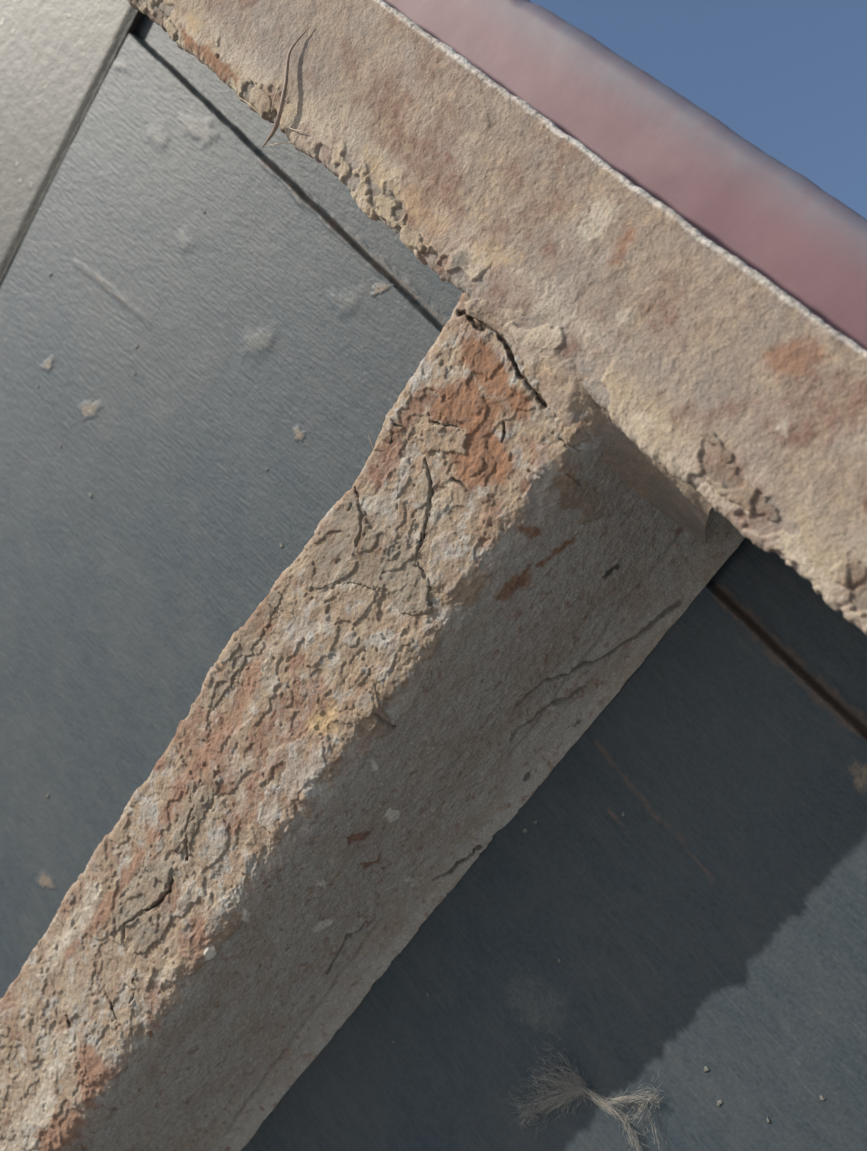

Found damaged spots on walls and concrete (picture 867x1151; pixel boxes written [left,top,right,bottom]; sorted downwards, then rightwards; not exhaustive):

peeling [127,0,184,50]
peeling [236,77,277,123]
peeling [364,185,432,255]
corrosion [256,153,539,501]
crack [454,308,548,409]
peeling [697,430,781,523]
crack [418,456,468,607]
peeling [829,553,867,617]
crack [505,595,686,745]
crack [121,853,189,940]
crack [104,968,138,1023]
corrosion [31,1032,129,1151]